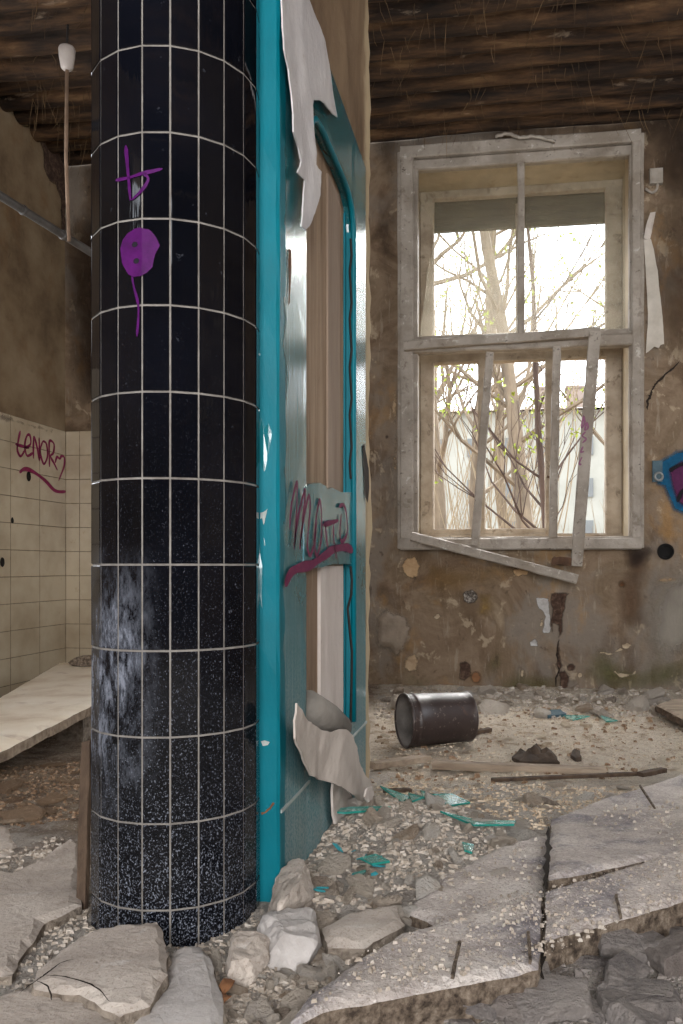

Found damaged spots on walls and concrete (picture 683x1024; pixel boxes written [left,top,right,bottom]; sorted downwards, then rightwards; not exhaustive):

peeling [280,0,337,230]
crack [646,362,679,410]
flaking render [377,610,418,671]
flaking render [530,593,582,689]
crack [553,641,561,686]
flaking render [330,783,352,824]
crack [540,827,552,979]